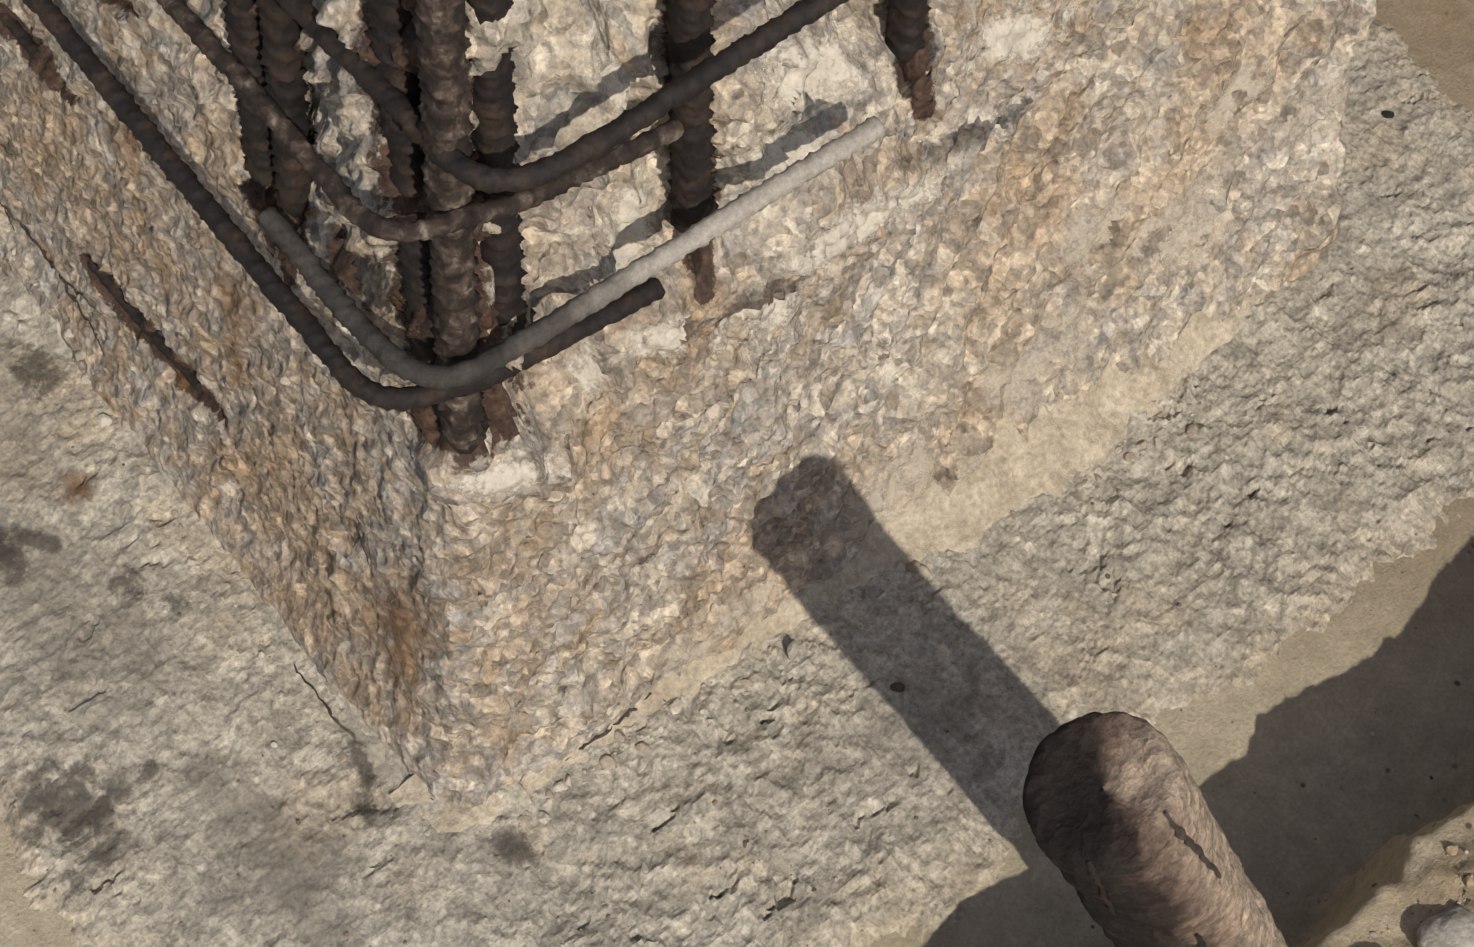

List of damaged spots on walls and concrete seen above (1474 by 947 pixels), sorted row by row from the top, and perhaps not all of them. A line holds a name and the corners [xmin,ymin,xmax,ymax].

spalling [0,3,77,106]
spalling [741,11,868,185]
rust [893,1,936,121]
crack [0,202,105,355]
rust [233,172,317,287]
rust [683,239,716,305]
spalling [627,92,1042,361]
spalling [79,253,228,425]
leakage [0,526,62,587]
leakage [108,565,142,599]
crack [293,664,370,751]
leakage [7,756,159,867]